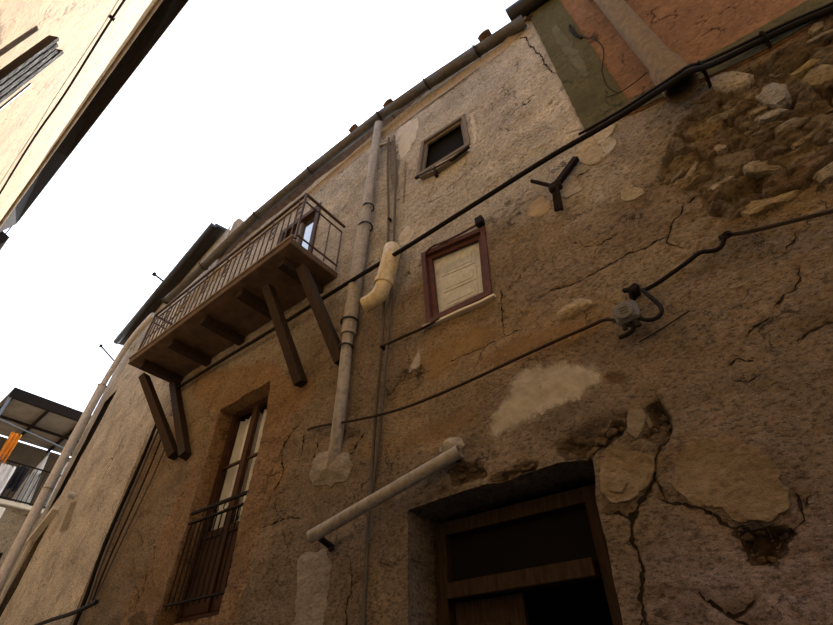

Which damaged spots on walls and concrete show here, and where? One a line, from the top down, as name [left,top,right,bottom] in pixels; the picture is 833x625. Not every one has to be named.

spalling [660,20,833,219]
crack [604,396,746,625]
crack [699,591,756,625]
crack [795,492,814,529]